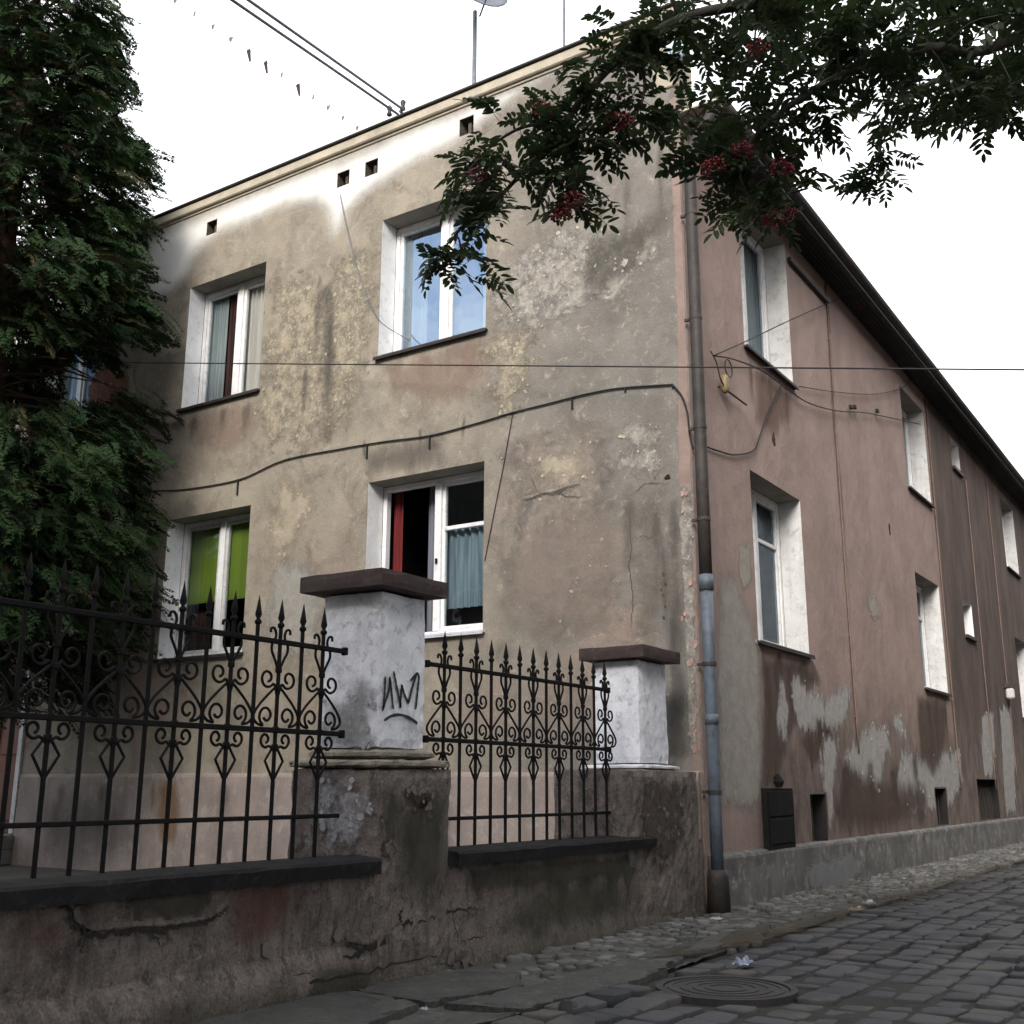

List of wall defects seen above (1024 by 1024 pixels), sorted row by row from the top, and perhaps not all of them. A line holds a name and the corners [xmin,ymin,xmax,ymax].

crack [523,481,581,501]
crack [627,482,666,628]
peeling [679,487,701,754]
spalling [308,777,373,849]
peeling [777,675,963,828]
peeling [981,703,1017,816]
crack [42,898,229,954]